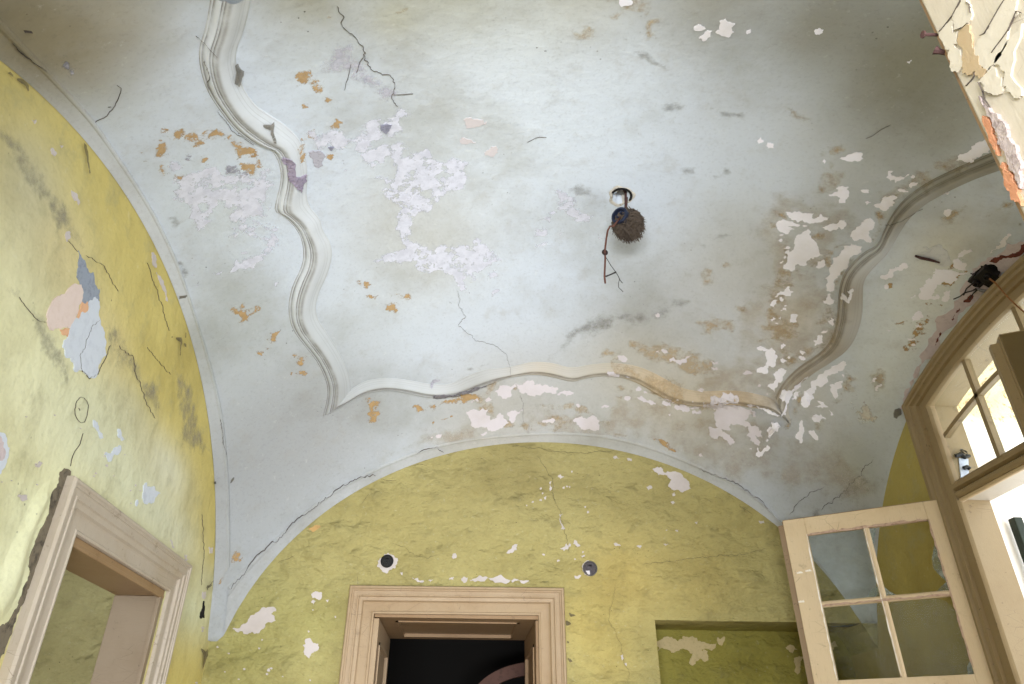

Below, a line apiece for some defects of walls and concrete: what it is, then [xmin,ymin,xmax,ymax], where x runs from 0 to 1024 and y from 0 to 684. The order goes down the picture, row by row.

crack [338,8,408,106]
peeling [939,0,1024,206]
peeling [776,171,918,305]
peeling [46,250,106,378]
crack [70,325,170,466]
peeling [430,379,609,436]
peeling [607,318,846,458]
flaking render [0,468,71,658]
peeling [233,607,276,649]
crack [201,447,444,586]
crack [512,445,611,551]
crack [702,460,873,514]